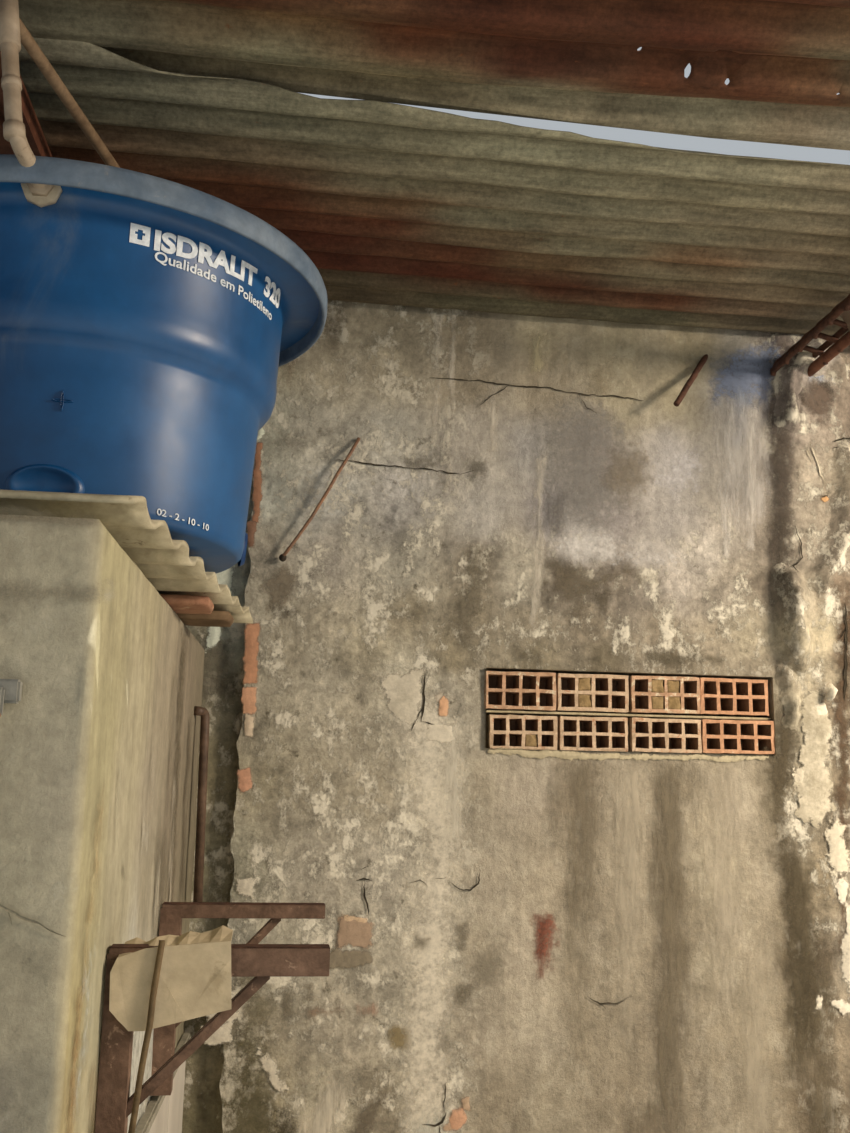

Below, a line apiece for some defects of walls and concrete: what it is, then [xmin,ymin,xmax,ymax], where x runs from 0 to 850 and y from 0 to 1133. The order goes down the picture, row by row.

crack [438,378,642,411]
spalling [247,427,265,547]
crack [336,459,474,474]
water stain [770,388,794,563]
water stain [532,534,642,615]
peeling [205,627,221,653]
spalling [241,623,260,737]
water stain [649,652,722,665]
spalling [237,767,252,792]
water stain [766,704,830,1059]
peeling [792,681,850,1018]
water stain [651,771,687,1115]